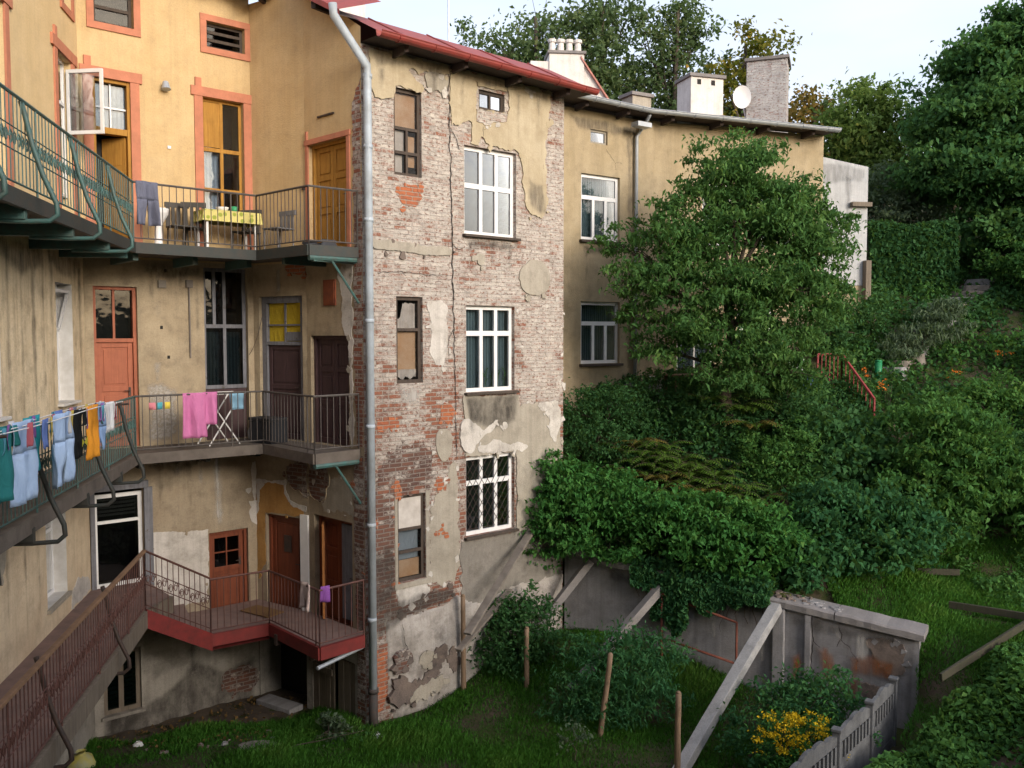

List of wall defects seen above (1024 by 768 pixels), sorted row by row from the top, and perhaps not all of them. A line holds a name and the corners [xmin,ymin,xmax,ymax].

flaking render [337,78,456,448]
crack [378,78,462,447]
peeling [438,402,528,459]
damp [469,397,512,424]
peeling [526,378,566,445]
flaking render [245,461,354,533]
spalling [377,643,461,713]
crack [810,615,858,677]